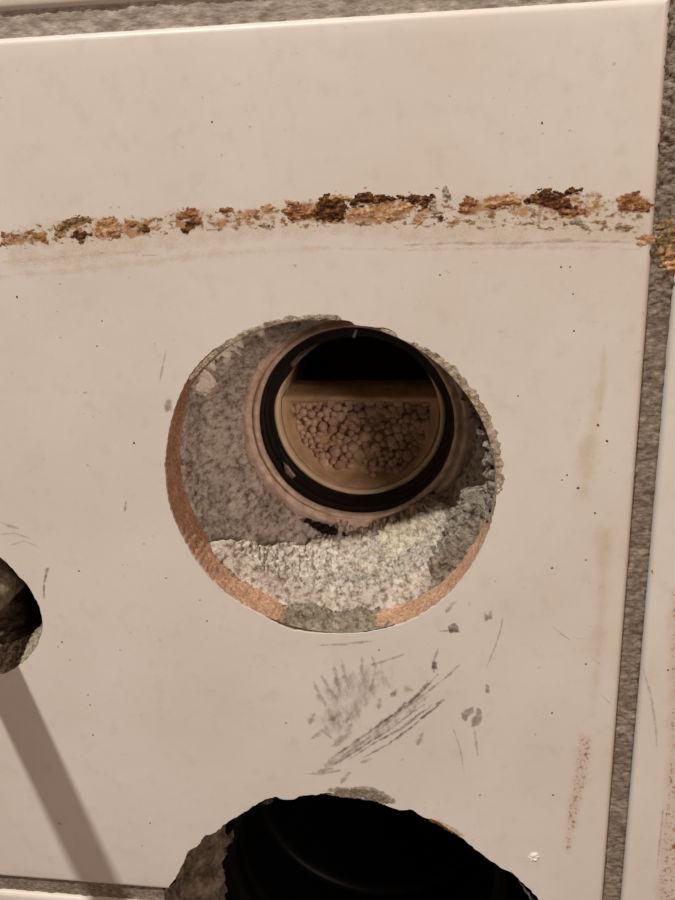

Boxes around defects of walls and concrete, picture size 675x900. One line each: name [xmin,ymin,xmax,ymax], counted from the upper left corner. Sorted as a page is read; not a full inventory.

corrosion [0,187,675,275]